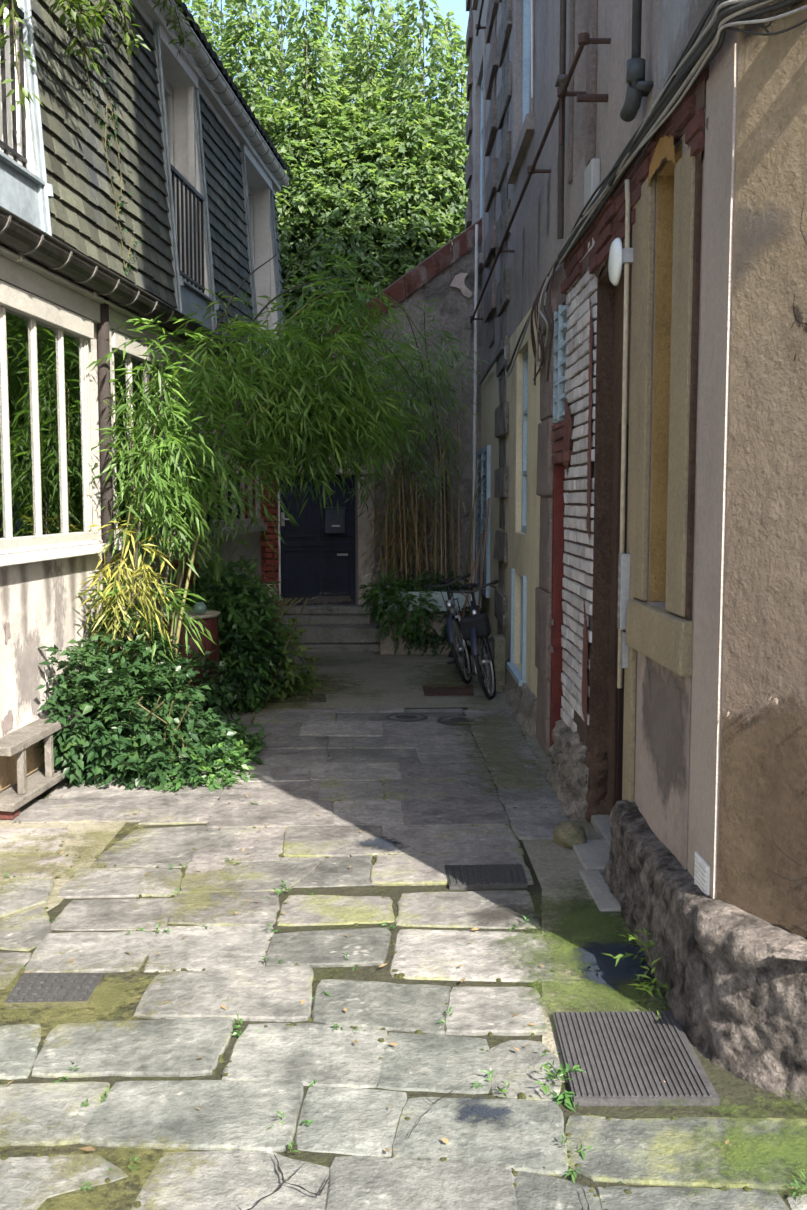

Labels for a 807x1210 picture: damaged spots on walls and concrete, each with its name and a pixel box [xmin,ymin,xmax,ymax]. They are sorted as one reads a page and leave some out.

water stain [659,0,713,80]
crack [791,293,807,360]
peeling [1,709,14,737]
crack [238,1154,330,1210]